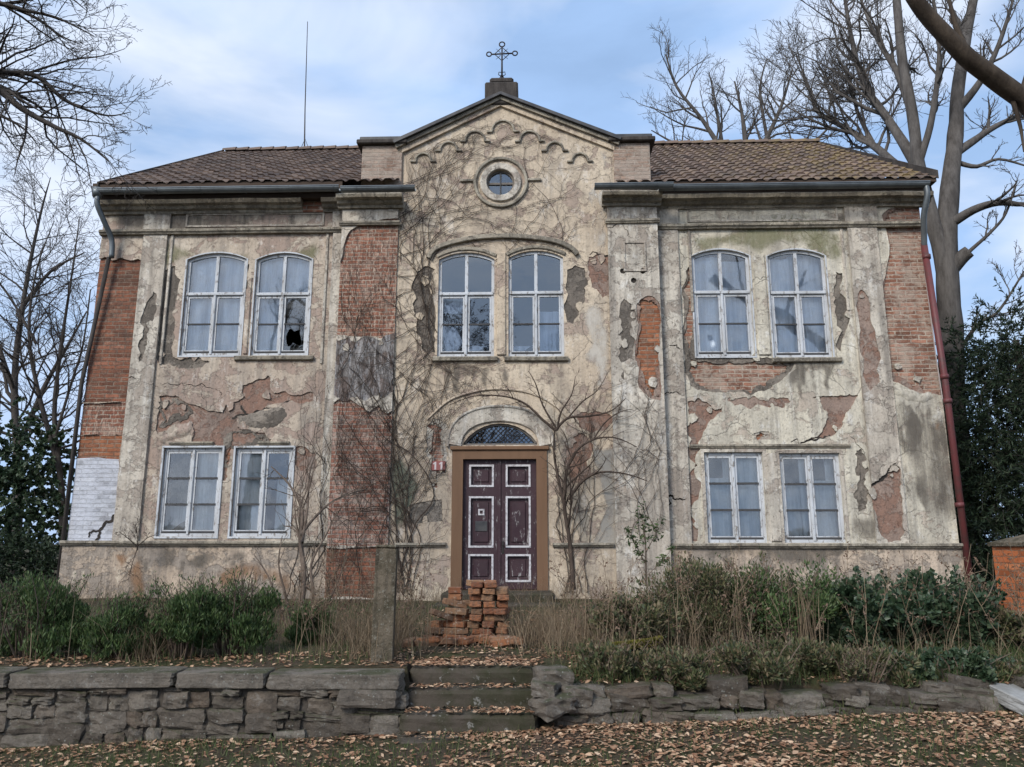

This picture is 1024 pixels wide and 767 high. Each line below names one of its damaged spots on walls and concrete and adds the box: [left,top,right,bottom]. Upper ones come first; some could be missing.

flaking render [78,258,209,459]
flaking render [156,376,313,481]
flaking render [325,219,398,598]
flaking render [412,266,436,353]
flaking render [564,254,609,324]
flaking render [618,296,662,400]
flaking render [682,267,795,541]
flaking render [810,395,857,439]
flaking render [833,207,941,395]
crack [88,514,114,546]
flaking render [853,449,904,542]